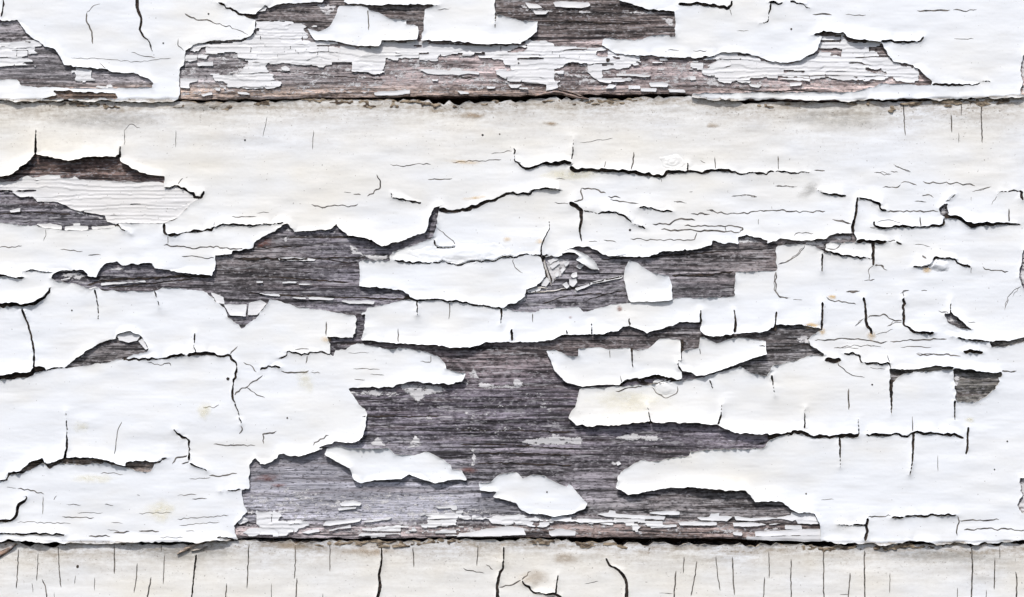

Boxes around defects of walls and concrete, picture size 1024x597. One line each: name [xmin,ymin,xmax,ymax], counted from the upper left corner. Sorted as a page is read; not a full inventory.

peeling [0,20,153,100]
peeling [179,0,932,100]
peeling [0,154,198,231]
crack [0,138,1023,473]
peeling [52,206,857,542]
peeling [889,365,1002,402]
crack [0,429,298,597]
crack [375,548,383,597]
crack [465,547,562,597]
crack [586,558,629,597]
crack [666,557,735,597]
crack [823,513,1024,597]